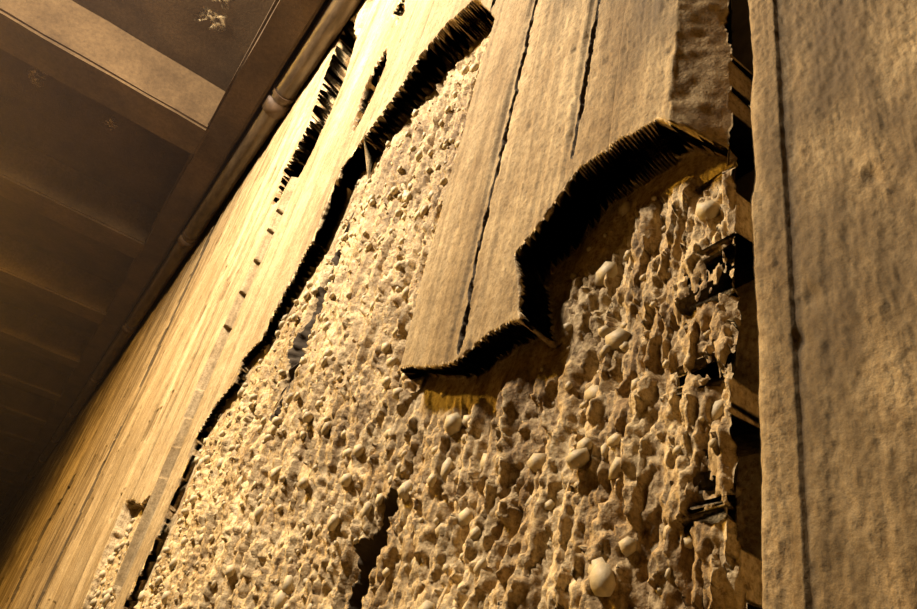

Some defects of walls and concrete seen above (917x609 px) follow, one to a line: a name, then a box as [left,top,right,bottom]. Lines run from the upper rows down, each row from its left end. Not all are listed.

spalling [81,0,763,609]